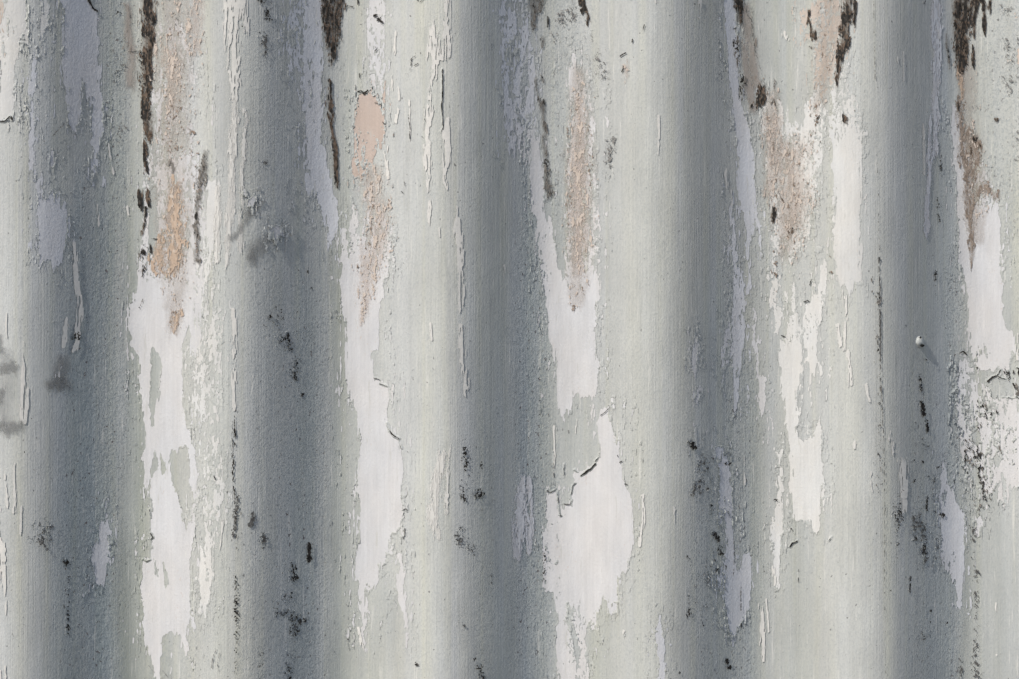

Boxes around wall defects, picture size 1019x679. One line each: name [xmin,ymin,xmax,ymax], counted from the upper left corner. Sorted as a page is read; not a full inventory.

peeling [0,0,269,679]
corrosion [147,174,189,278]
peeling [239,0,419,679]
peeling [492,0,644,679]
peeling [623,603,681,679]
peeling [683,0,869,670]
peeling [890,98,1019,679]
corrosion [955,68,1000,268]
peeling [994,36,1019,96]